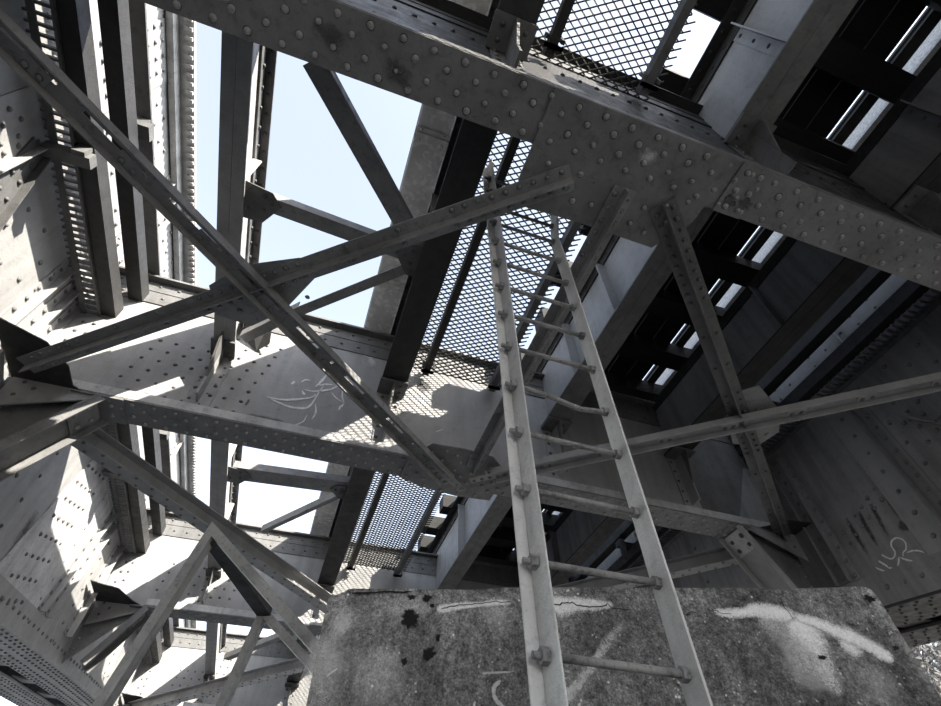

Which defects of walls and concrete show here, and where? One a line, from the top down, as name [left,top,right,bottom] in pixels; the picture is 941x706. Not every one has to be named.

crack [554,602,630,610]